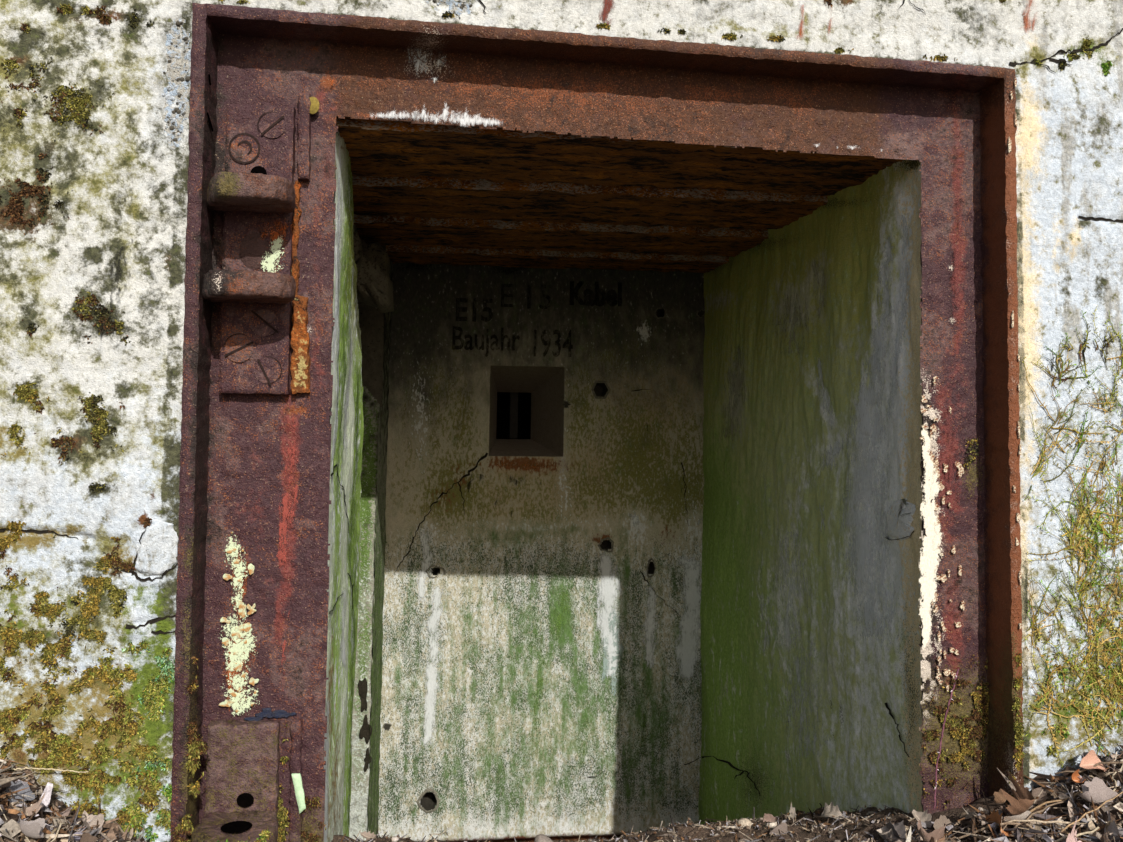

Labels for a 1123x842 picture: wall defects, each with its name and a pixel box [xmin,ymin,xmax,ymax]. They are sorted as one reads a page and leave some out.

crack [1009,28,1123,73]
crack [1078,215,1123,223]
water stain [333,178,361,478]
peeling [919,395,964,525]
crack [0,527,78,539]
crack [108,530,178,581]
crack [125,615,176,635]
water stain [340,494,358,827]
water stain [416,530,443,744]
water stain [597,554,625,702]
water stain [675,556,702,680]
peeling [931,545,965,692]